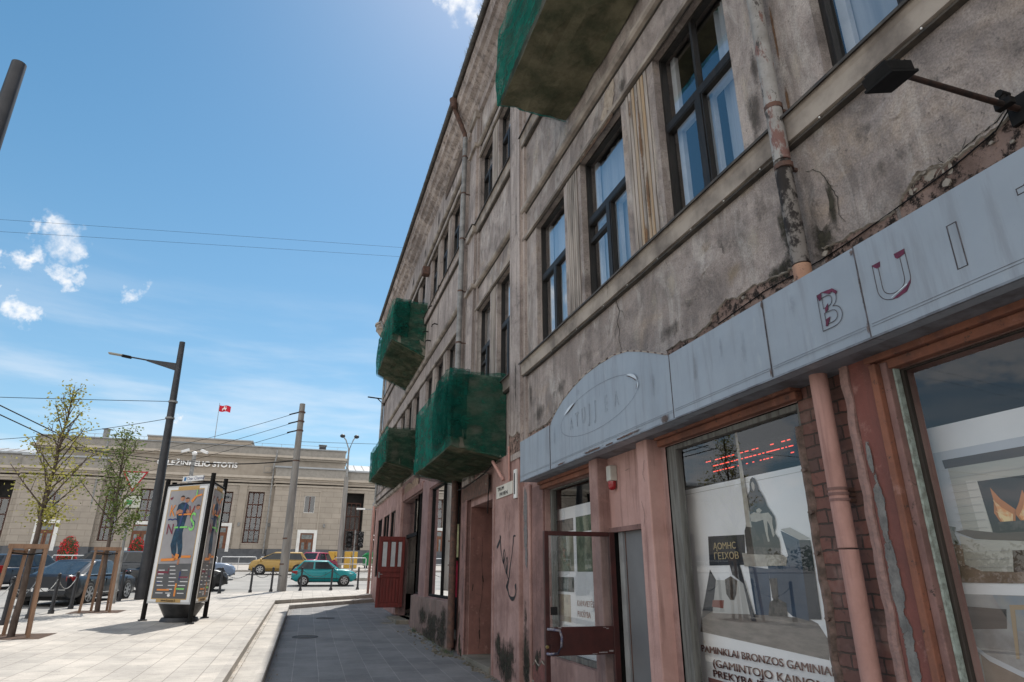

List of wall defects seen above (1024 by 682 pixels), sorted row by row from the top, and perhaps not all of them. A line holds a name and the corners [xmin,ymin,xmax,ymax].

flaking render [822,115,1024,263]
flaking render [666,267,795,355]
peeling [865,441,922,682]
damp [420,608,446,648]
damp [495,608,541,682]